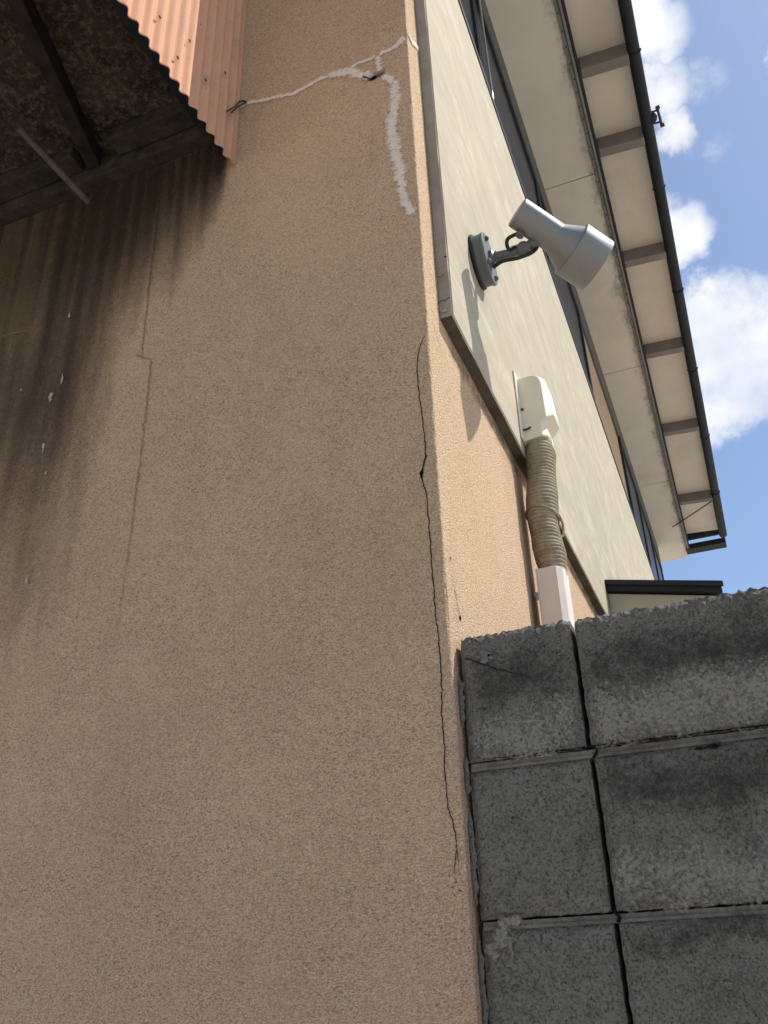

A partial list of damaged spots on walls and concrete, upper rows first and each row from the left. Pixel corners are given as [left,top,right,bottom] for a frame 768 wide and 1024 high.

crack [239,34,418,215]
leakage [0,143,226,366]
crack [417,334,514,896]